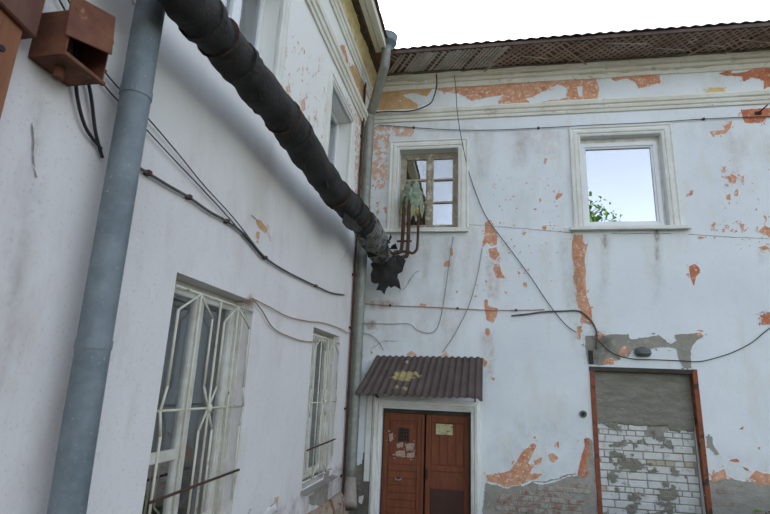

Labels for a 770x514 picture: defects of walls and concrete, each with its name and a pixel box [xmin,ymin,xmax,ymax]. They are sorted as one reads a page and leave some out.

peeling [340,44,364,100]
peeling [377,79,602,110]
peeling [610,75,664,90]
peeling [709,106,770,138]
peeling [719,68,770,89]
peeling [370,123,418,222]
peeling [696,160,770,254]
peeling [475,280,501,337]
peeling [482,219,530,294]
spalling [538,176,707,370]
spalling [480,434,598,514]
spalling [704,432,770,514]